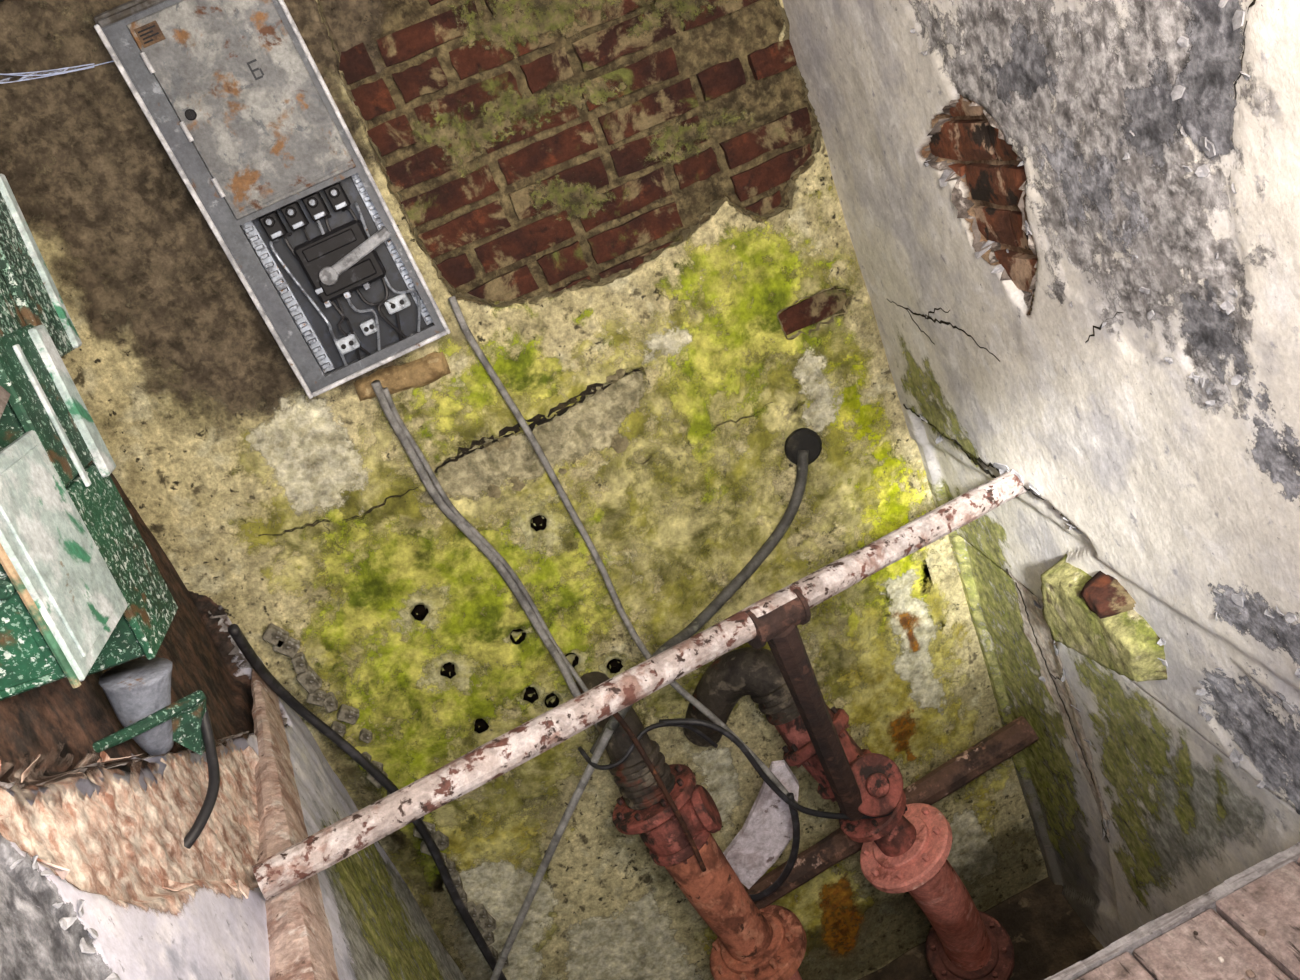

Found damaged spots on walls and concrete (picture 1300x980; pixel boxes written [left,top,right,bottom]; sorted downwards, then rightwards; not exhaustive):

water stain [980,18,1059,105]
flaking render [316,0,822,308]
water stain [1035,56,1181,264]
peeling [909,0,1300,507]
water stain [246,396,368,516]
water stain [643,321,692,363]
water stain [792,349,843,432]
water stain [1180,279,1253,411]
water stain [880,569,946,715]
water stain [693,747,743,827]
flaking render [0,734,259,980]
rust [818,876,864,957]